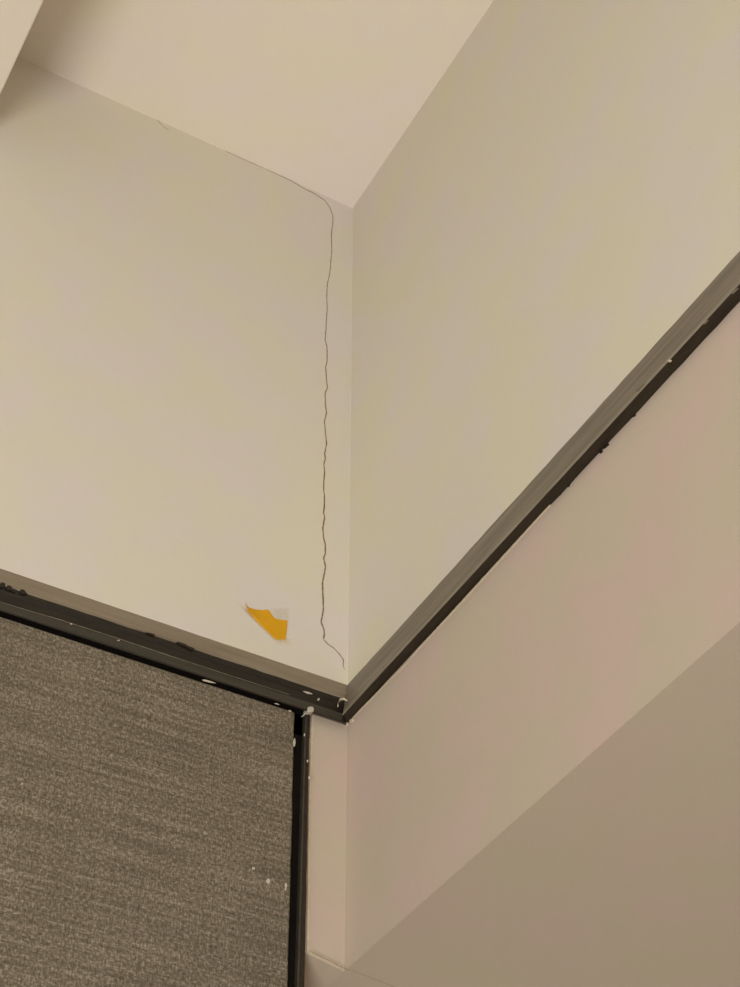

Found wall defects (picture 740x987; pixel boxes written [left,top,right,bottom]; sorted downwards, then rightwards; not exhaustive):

crack [226,151,345,670]